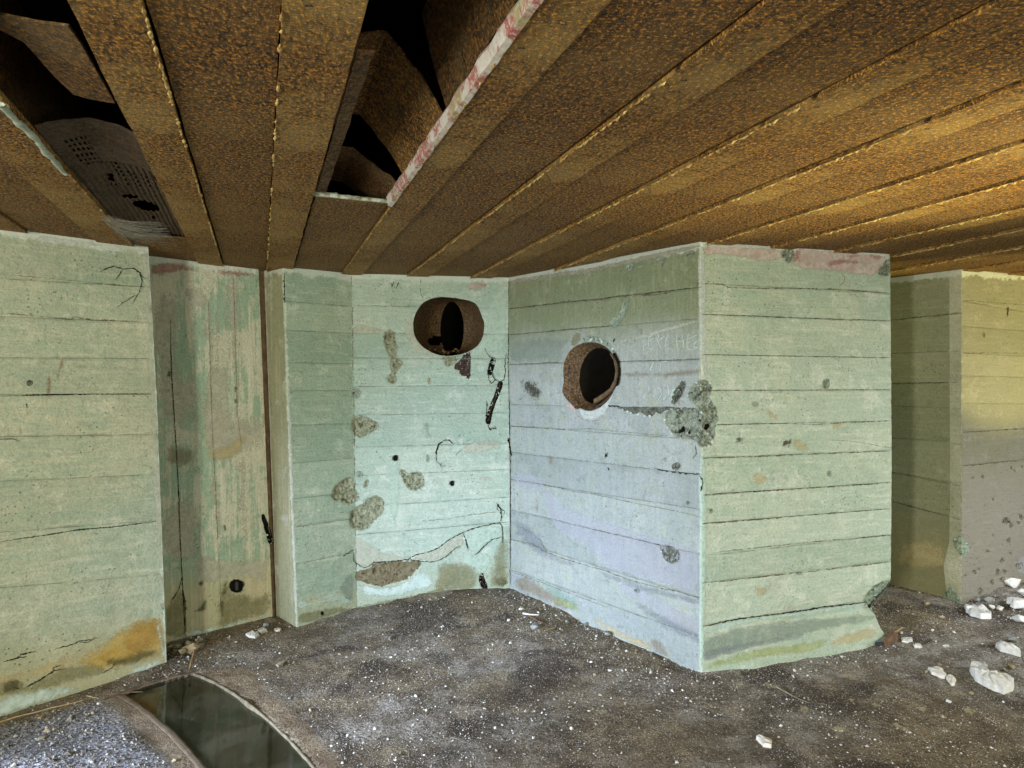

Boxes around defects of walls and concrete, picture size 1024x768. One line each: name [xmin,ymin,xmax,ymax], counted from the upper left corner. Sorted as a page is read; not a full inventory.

crack [4,266,145,322]
spalling [382,318,458,384]
crack [2,319,186,638]
spalling [351,415,380,438]
spalling [399,455,429,491]
crack [342,274,1018,607]
peeling [572,244,890,665]
spalling [332,471,500,587]
crack [4,638,94,689]